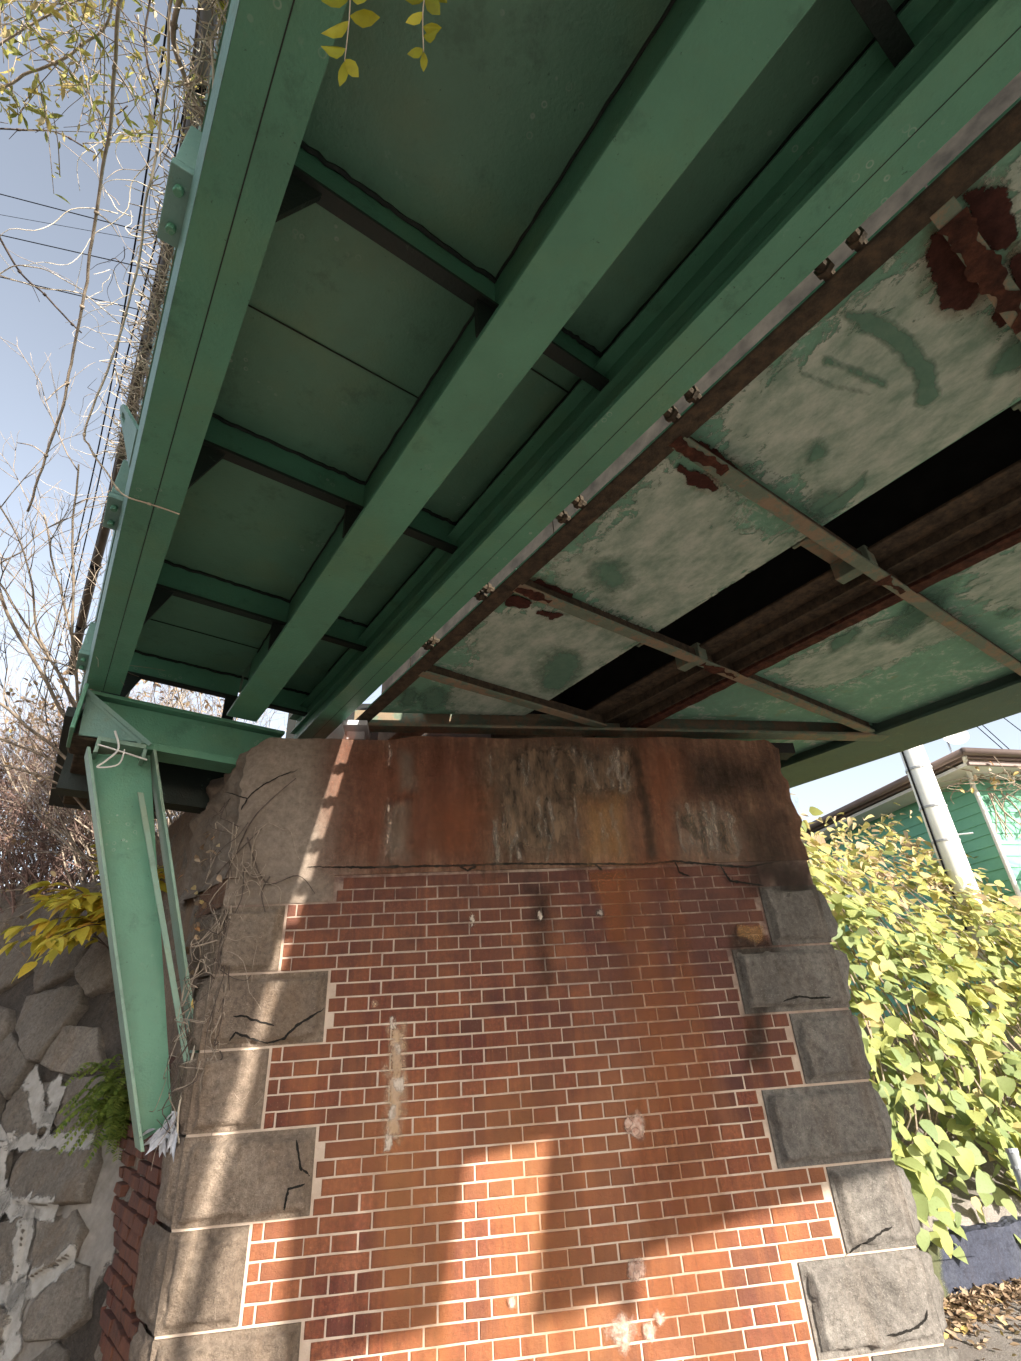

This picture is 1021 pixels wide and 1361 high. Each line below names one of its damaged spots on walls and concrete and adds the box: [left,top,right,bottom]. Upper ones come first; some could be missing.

rust [926,186,1021,335]
peeling [698,241,1021,524]
rust [669,436,738,492]
rust [505,579,573,620]
peeling [400,454,807,716]
peeling [764,543,1021,693]
crack [229,1008,324,1044]
crack [784,994,831,1002]
crack [283,1139,310,1211]
crack [850,1227,892,1253]
spalling [611,1312,664,1351]
crack [887,1311,928,1337]